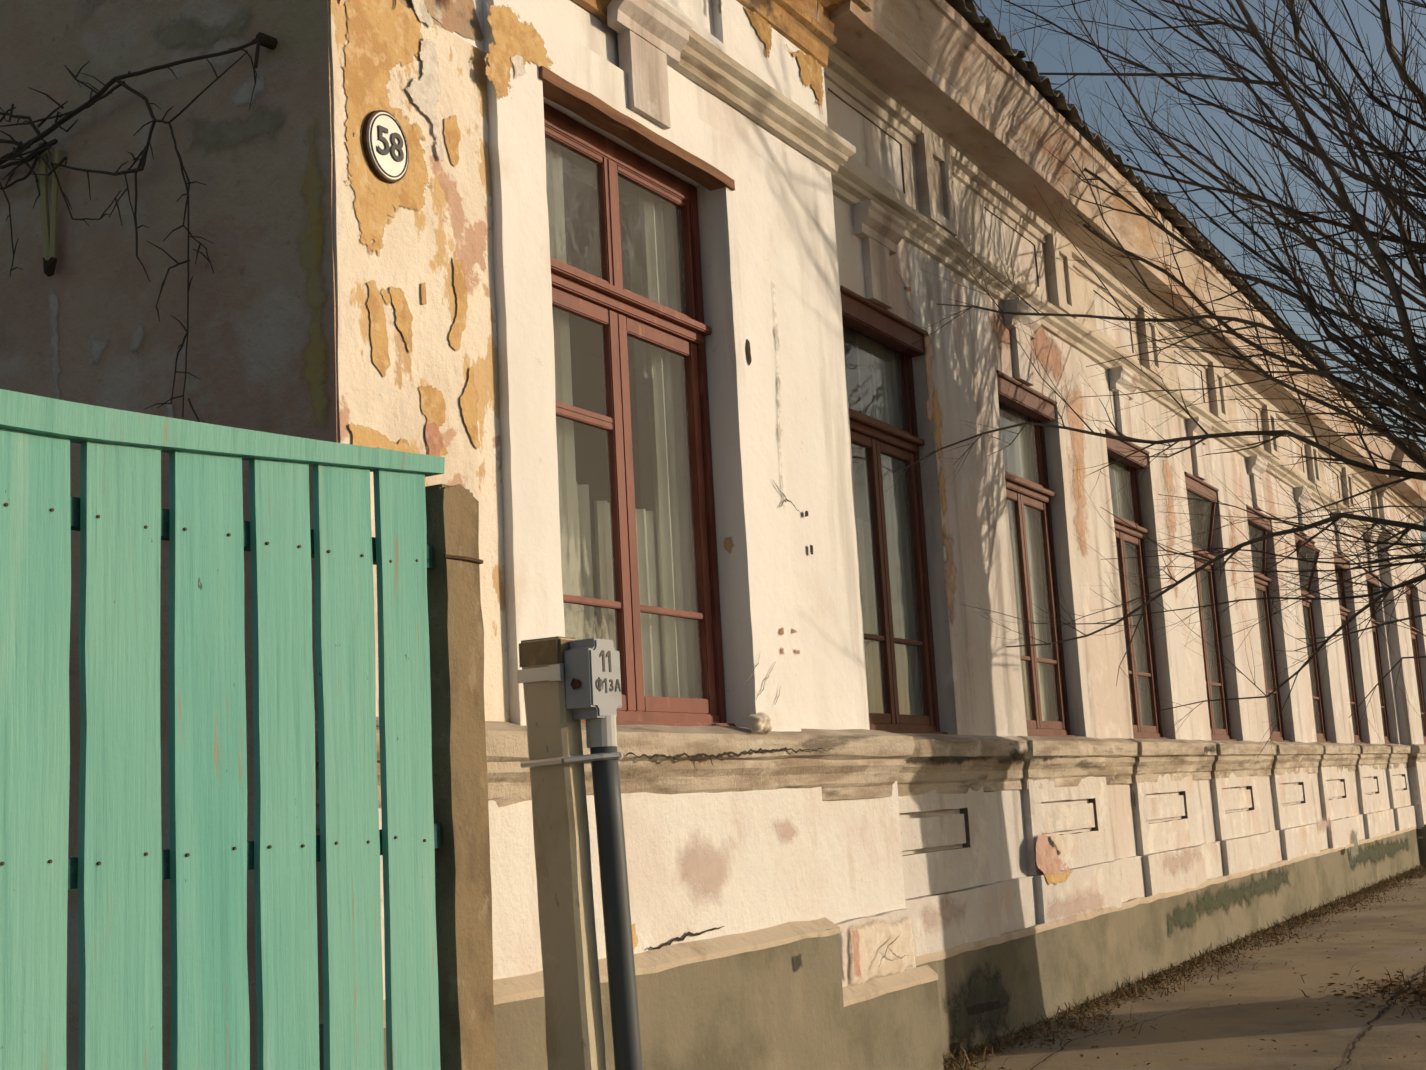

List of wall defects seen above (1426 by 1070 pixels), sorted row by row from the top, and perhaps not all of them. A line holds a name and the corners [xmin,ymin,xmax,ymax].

spalling [484,4,553,99]
spalling [341,0,434,257]
spalling [444,115,461,166]
spalling [367,280,427,377]
spalling [449,257,468,351]
spalling [349,367,480,457]
spalling [1036,831,1073,885]
crack [648,926,724,950]